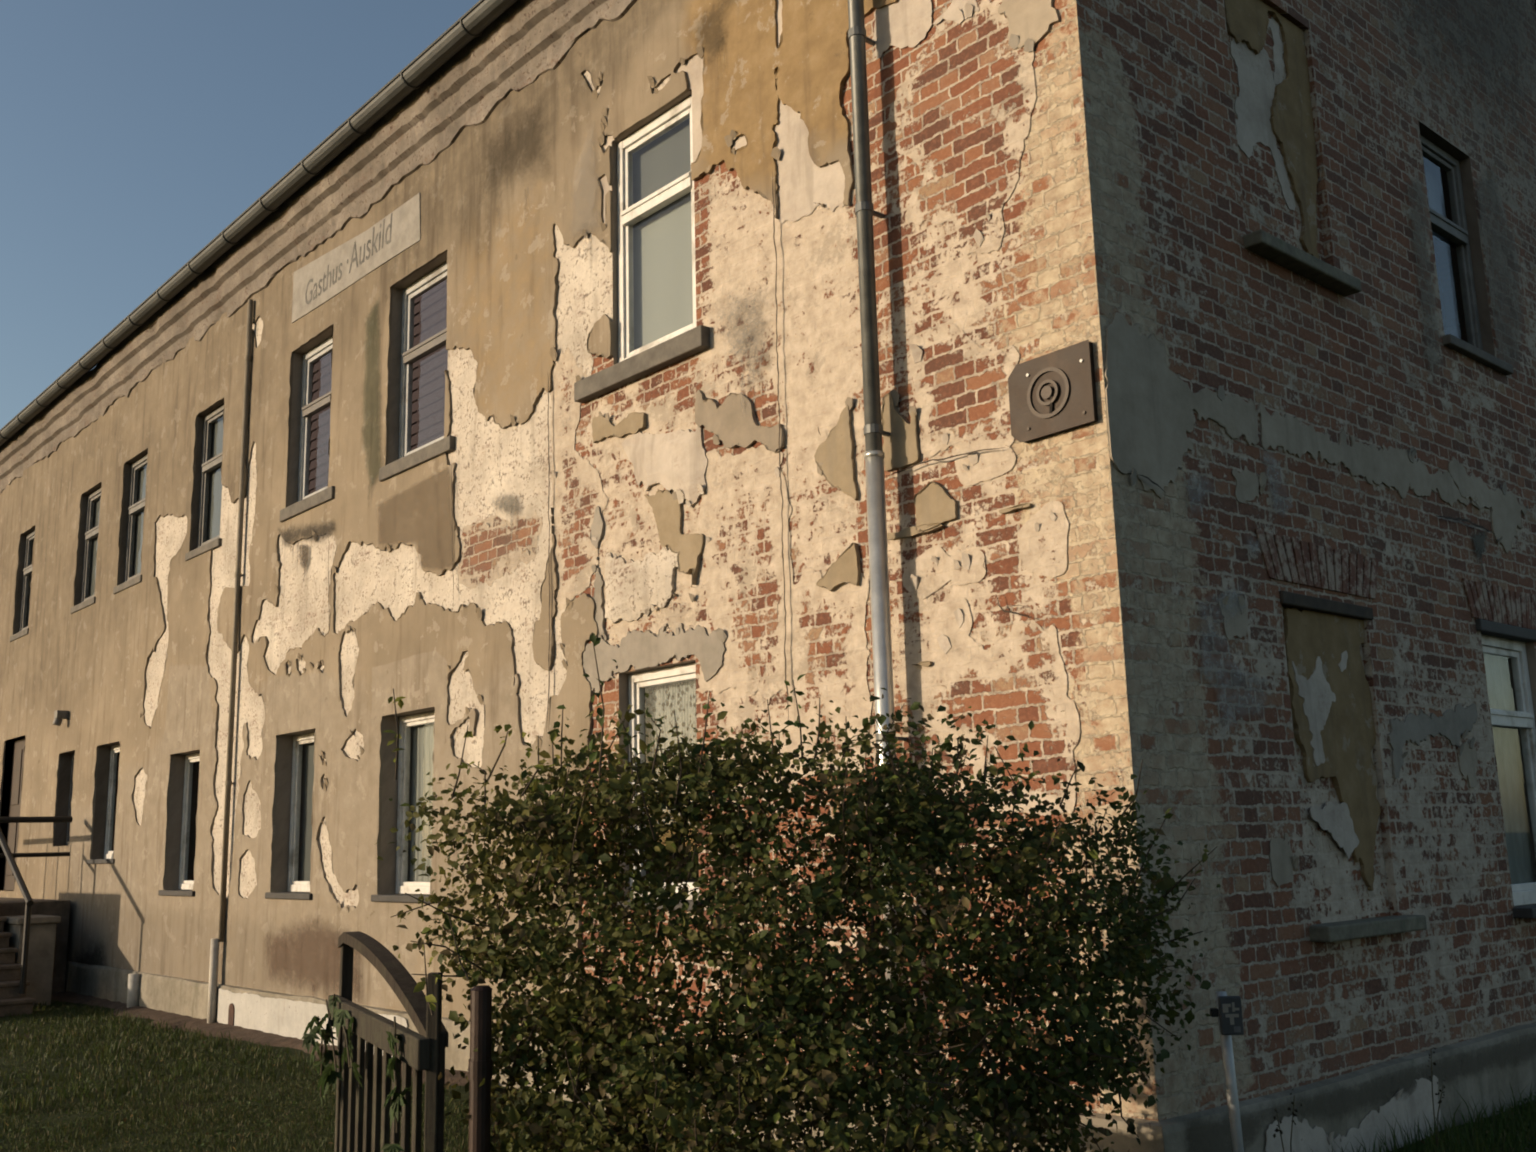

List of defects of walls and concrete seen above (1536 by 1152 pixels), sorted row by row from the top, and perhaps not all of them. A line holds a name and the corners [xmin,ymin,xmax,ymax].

peeling [771,100,845,223]
flaking render [872,0,1036,255]
flaking render [1230,17,1296,211]
flaking render [889,323,1019,486]
peeling [134,768,147,825]
peeling [144,515,187,727]
peeling [208,175,613,898]
flaking render [688,434,872,778]
flaking render [902,545,1080,816]
flaking render [1018,501,1069,578]
flaking render [1292,651,1348,766]
peeling [1265,1075,1441,1152]